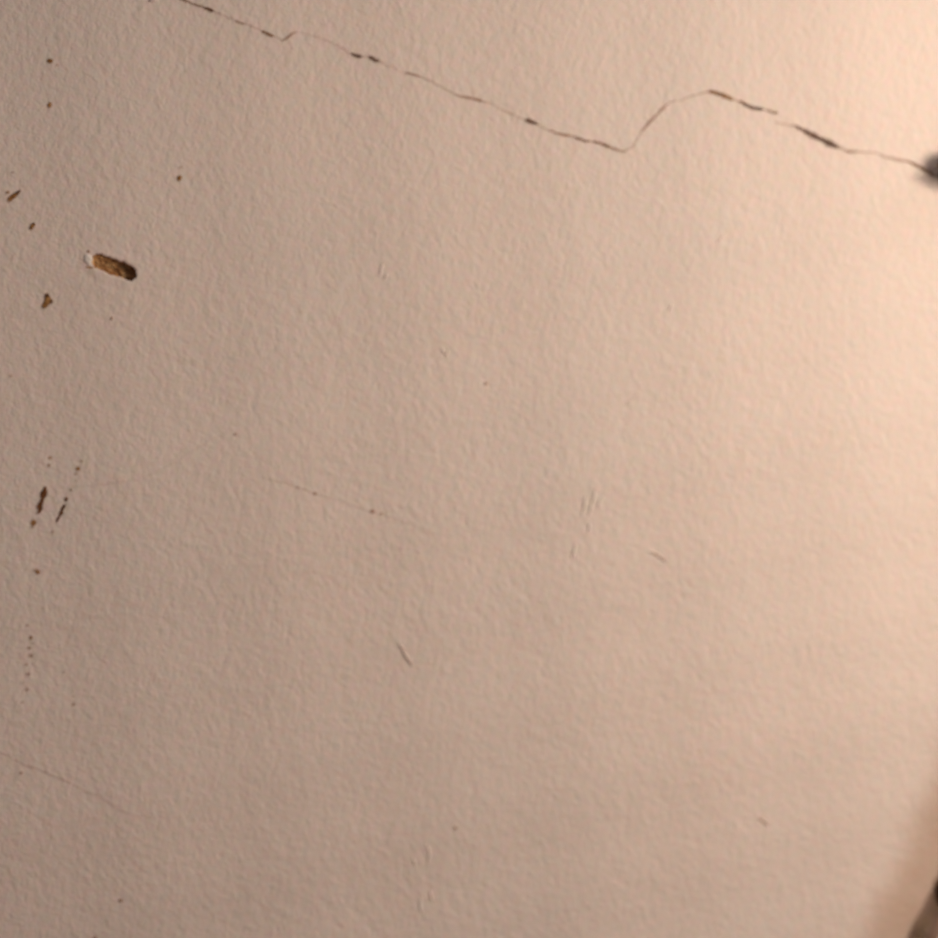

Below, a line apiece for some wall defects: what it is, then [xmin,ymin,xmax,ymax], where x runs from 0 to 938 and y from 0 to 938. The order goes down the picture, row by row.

crack [351,53,379,62]
crack [526,119,625,152]
crack [708,90,838,148]
crack [901,160,936,176]
spalling [81,244,146,291]